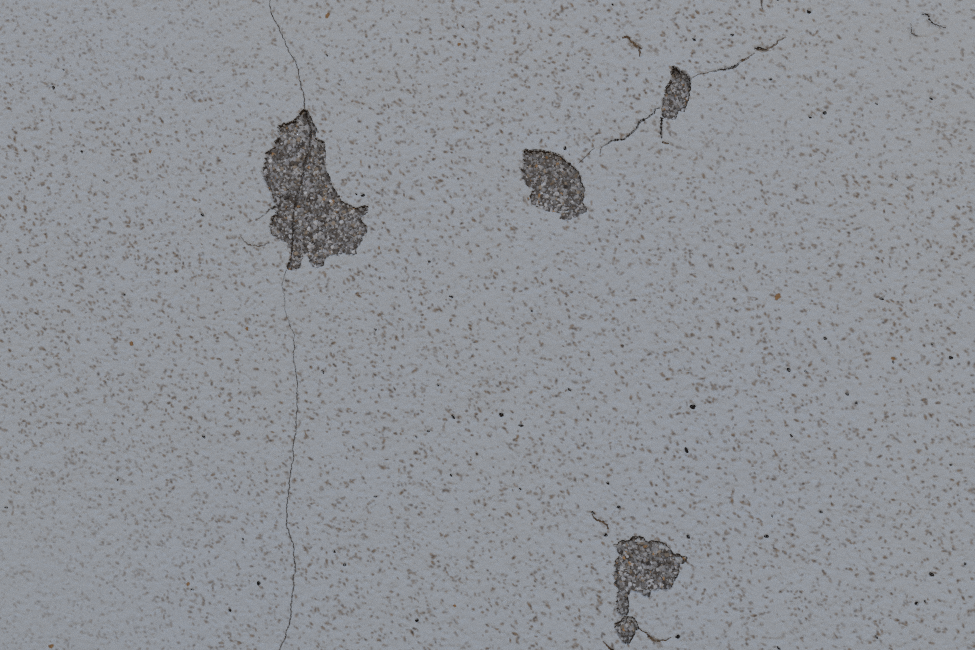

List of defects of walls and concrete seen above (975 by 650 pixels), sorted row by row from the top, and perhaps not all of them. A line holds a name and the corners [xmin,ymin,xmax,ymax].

crack [269,3,305,108]
crack [622,36,642,57]
spalling [661,66,691,120]
crack [696,38,784,76]
crack [579,107,669,163]
spalling [261,109,369,271]
spalling [521,149,587,221]
crack [279,272,298,650]
spalling [614,536,687,644]